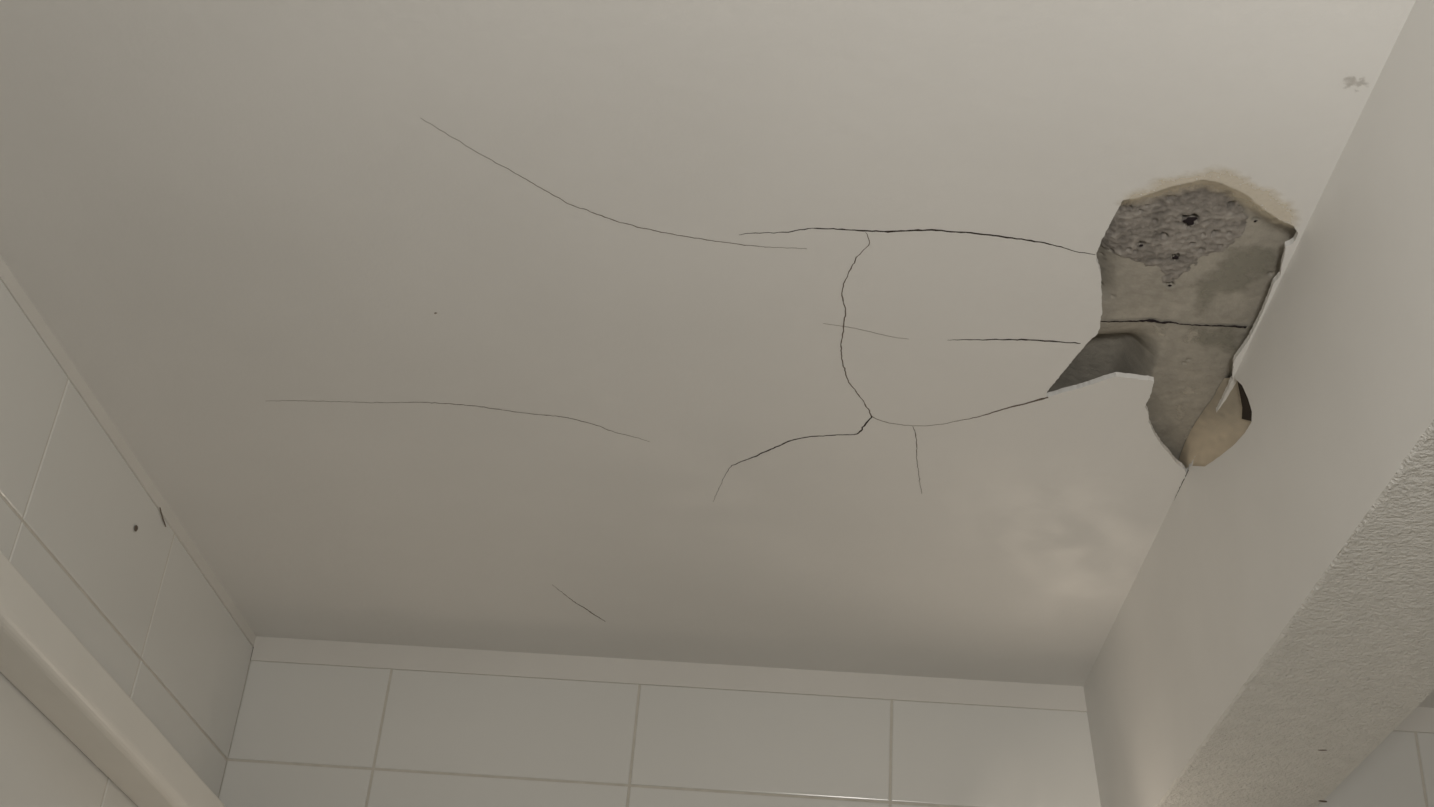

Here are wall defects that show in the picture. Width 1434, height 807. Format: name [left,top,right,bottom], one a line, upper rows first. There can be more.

crack [421,118,1095,496]
spalling [1047,180,1296,468]